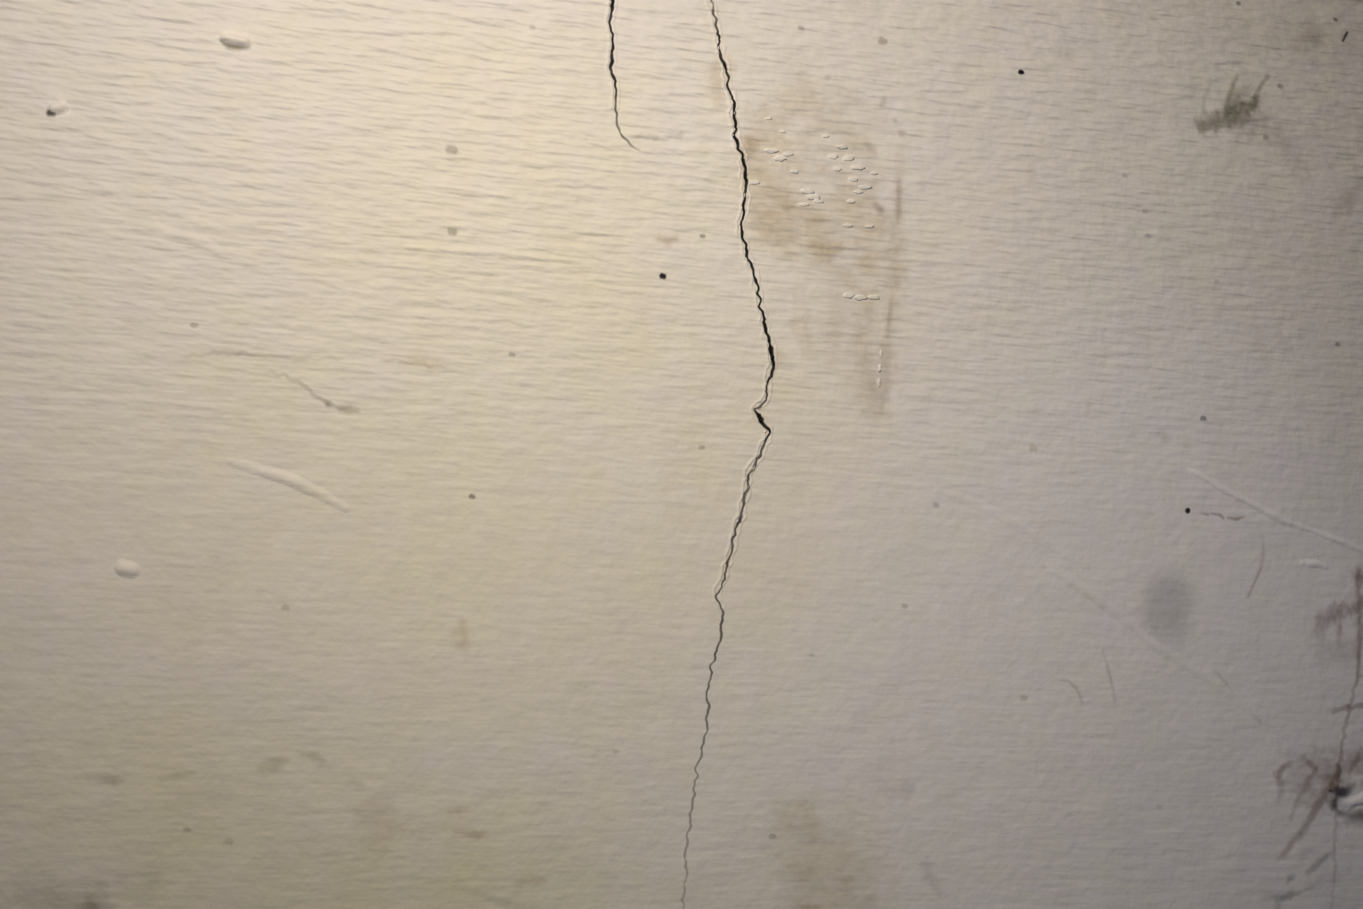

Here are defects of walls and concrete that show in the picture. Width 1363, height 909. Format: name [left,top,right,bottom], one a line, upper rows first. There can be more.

crack [603,0,621,120]
leakage [822,135,878,203]
crack [704,0,778,712]